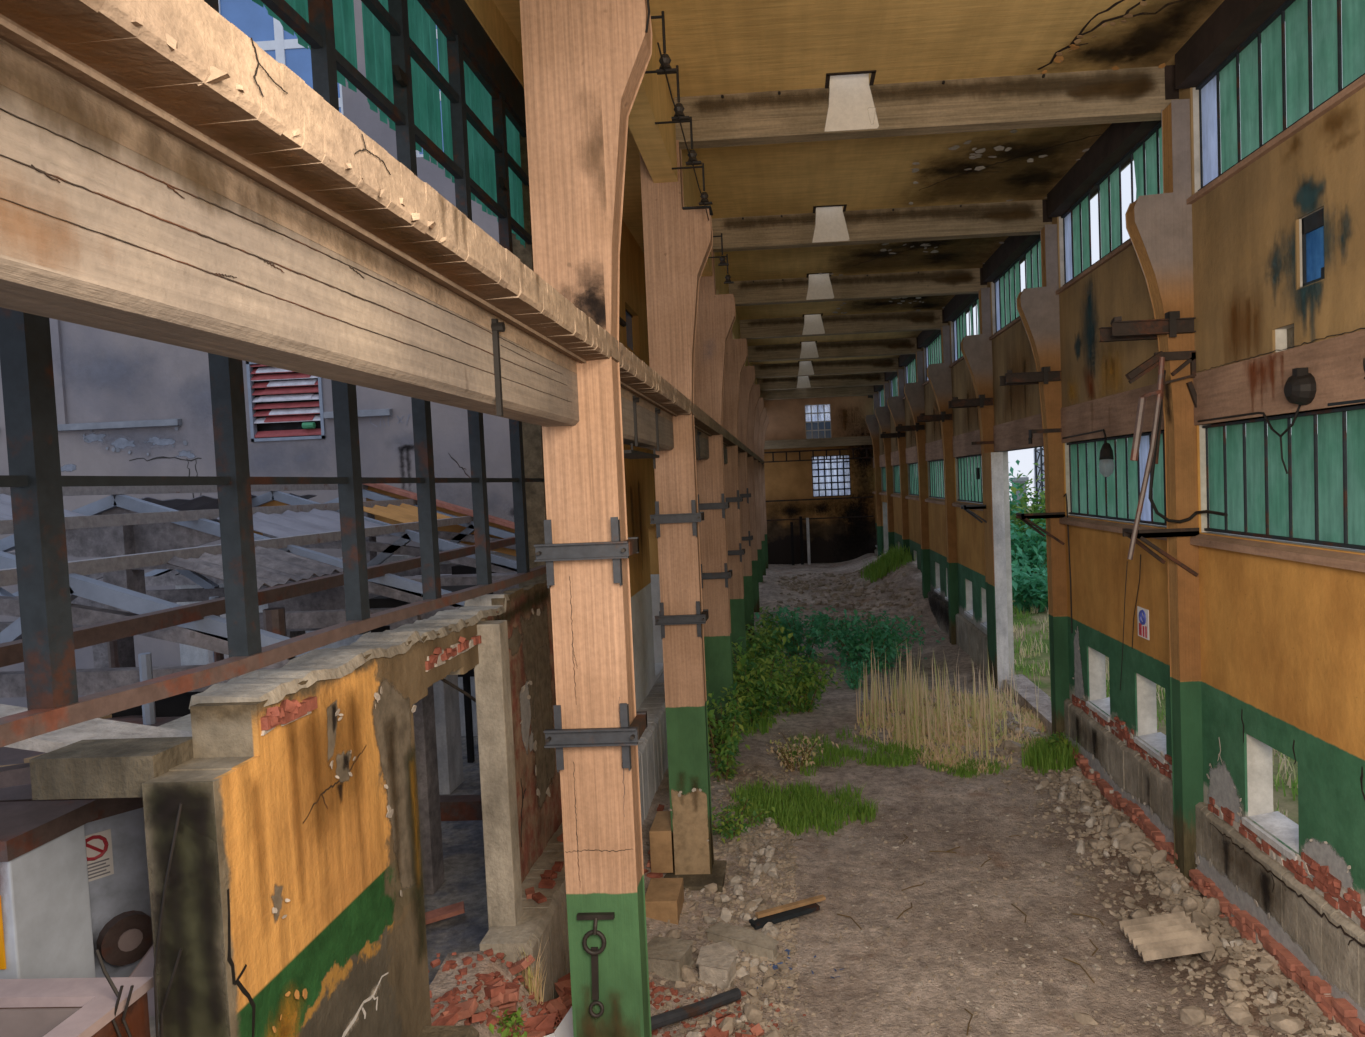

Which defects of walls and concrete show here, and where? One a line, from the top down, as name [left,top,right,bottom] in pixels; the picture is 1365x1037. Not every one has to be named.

crack [251,38,288,97]
leakage [698,0,1204,132]
leakage [580,296,606,325]
leakage [725,129,1090,388]
leakage [1271,234,1320,330]
spalling [260,696,356,800]
spalling [1072,626,1172,780]
crack [227,889,256,1037]
crack [342,972,388,1037]
spalling [1194,853,1365,1024]
spalling [1206,761,1365,930]
crack [1210,823,1365,948]